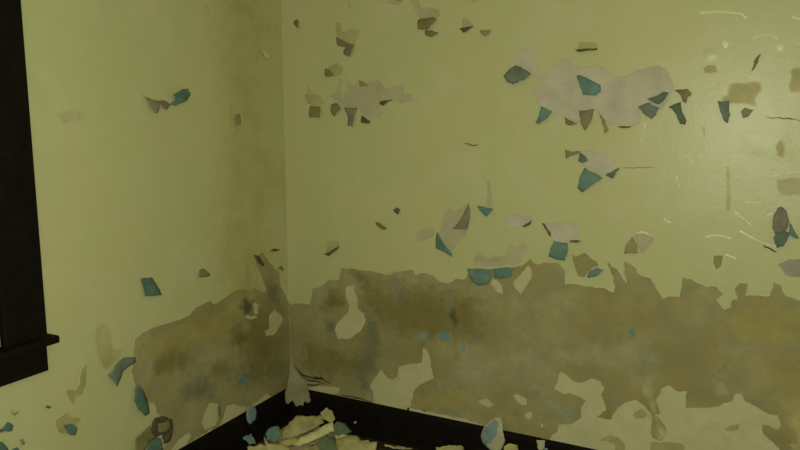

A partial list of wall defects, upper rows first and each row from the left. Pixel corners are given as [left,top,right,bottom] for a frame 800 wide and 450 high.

peeling [334,21,361,57]
peeling [385,0,441,37]
peeling [140,88,190,113]
peeling [304,62,413,126]
peeling [504,47,692,133]
peeling [718,83,760,123]
peeling [565,149,620,192]
peeling [435,180,494,257]
peeling [96,207,800,450]
crack [296,367,331,386]